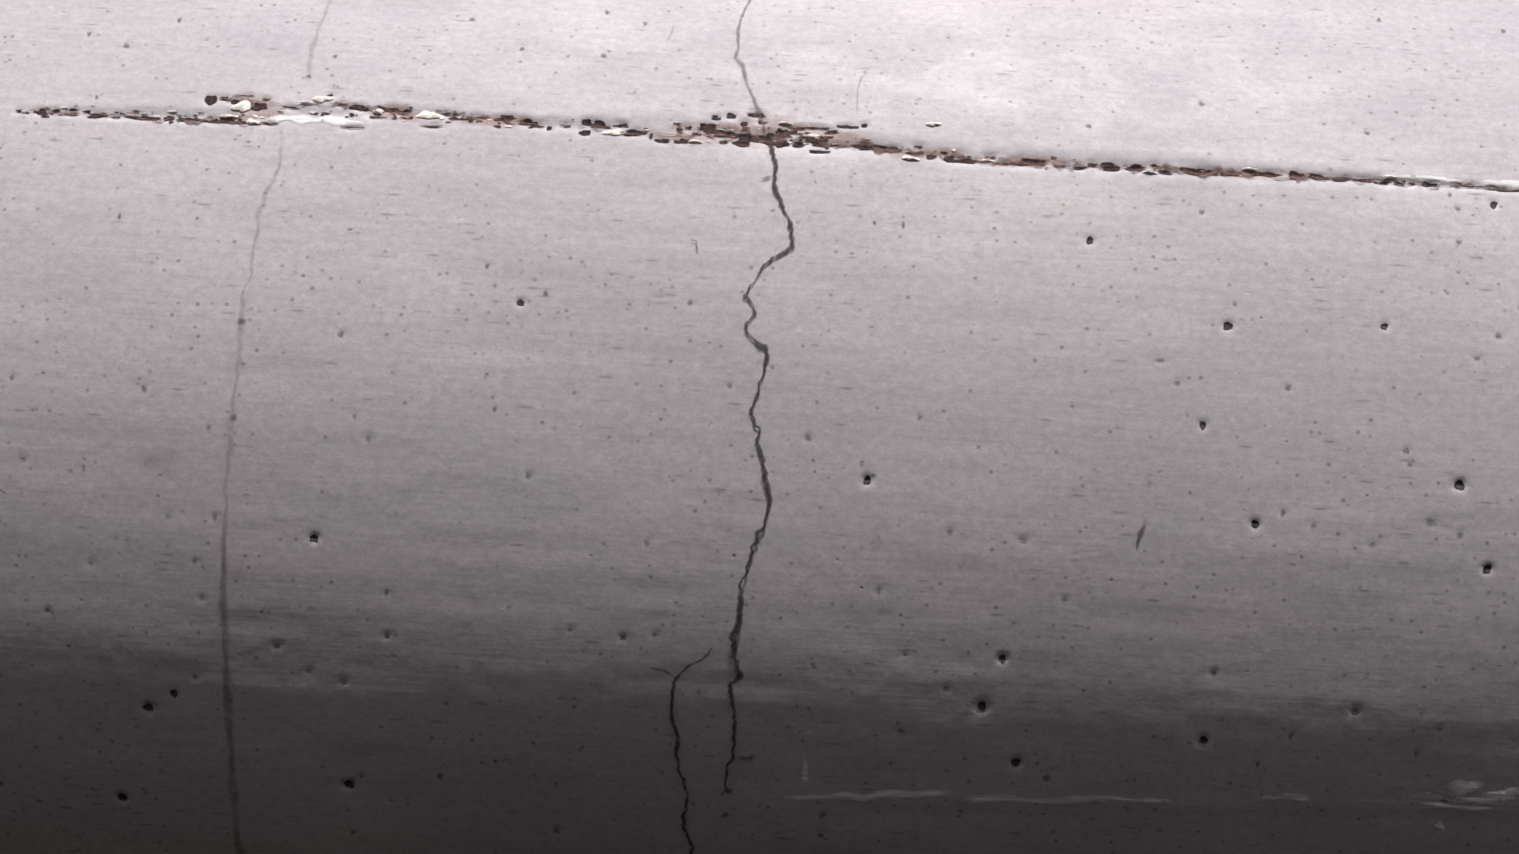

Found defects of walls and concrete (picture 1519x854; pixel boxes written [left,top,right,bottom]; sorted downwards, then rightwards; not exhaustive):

crack [651,45,795,854]
spalling [15,94,1519,191]